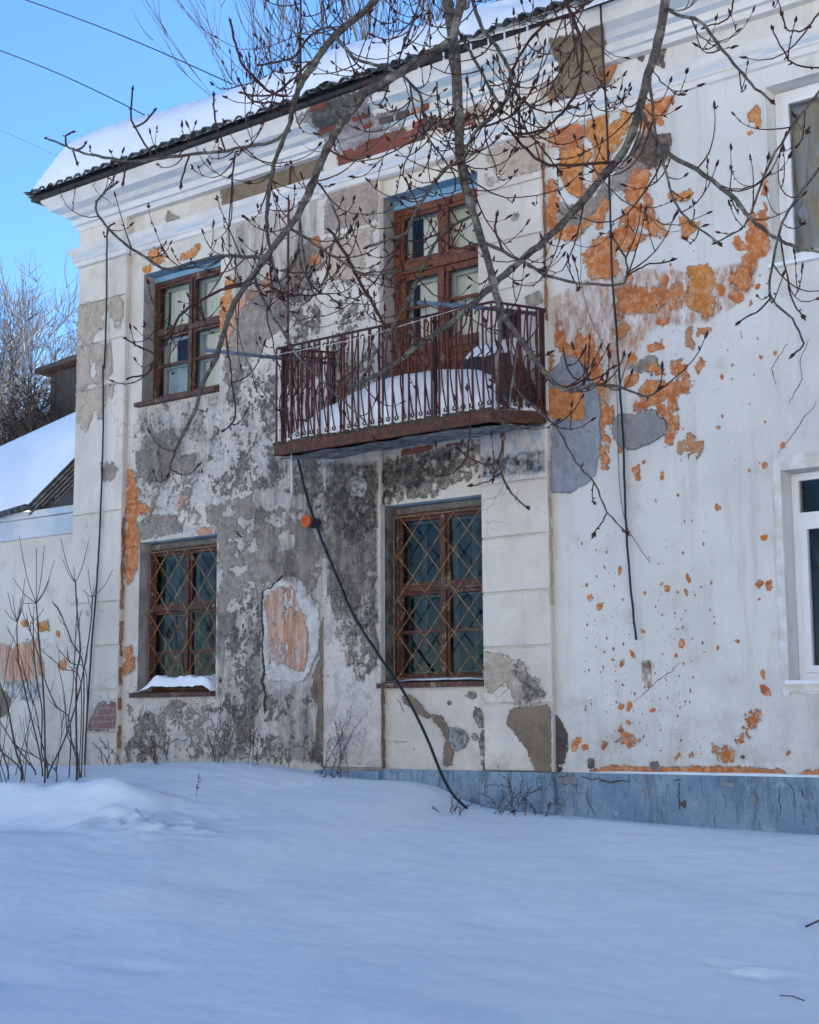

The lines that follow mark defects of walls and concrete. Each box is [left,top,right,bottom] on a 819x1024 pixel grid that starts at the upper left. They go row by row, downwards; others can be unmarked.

flaking render [308,87,486,166]
peeling [75,295,124,433]
peeling [484,95,771,481]
spalling [122,396,380,677]
spalling [482,548,786,787]